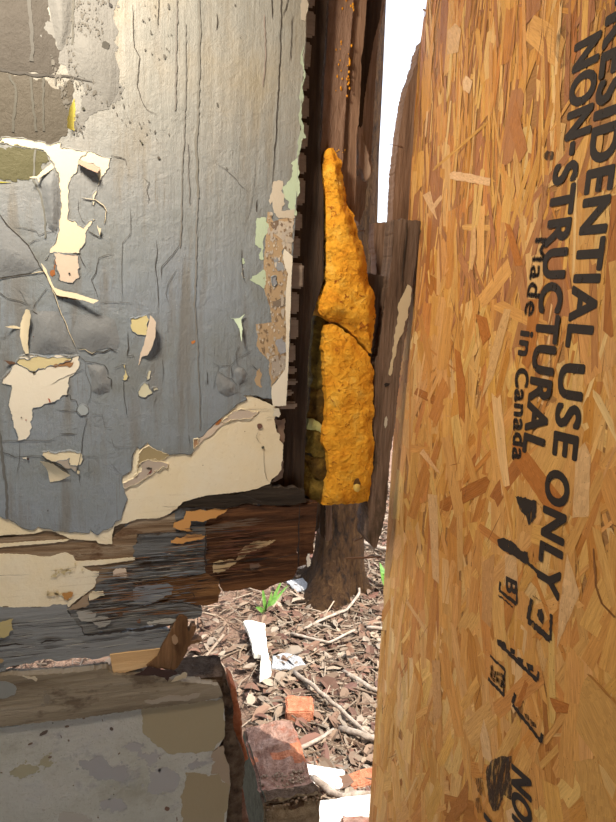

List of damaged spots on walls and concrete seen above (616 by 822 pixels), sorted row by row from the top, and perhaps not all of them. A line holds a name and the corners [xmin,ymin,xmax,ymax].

crack [0,68,92,82]
water stain [0,0,169,238]
crack [132,9,153,113]
crack [216,0,292,222]
peeling [0,137,110,283]
water stain [144,0,202,429]
peeling [241,44,306,443]
water stain [0,433,9,519]
peeling [2,354,79,440]
crack [0,215,135,485]
peeling [144,508,227,561]
flaking render [141,655,231,822]